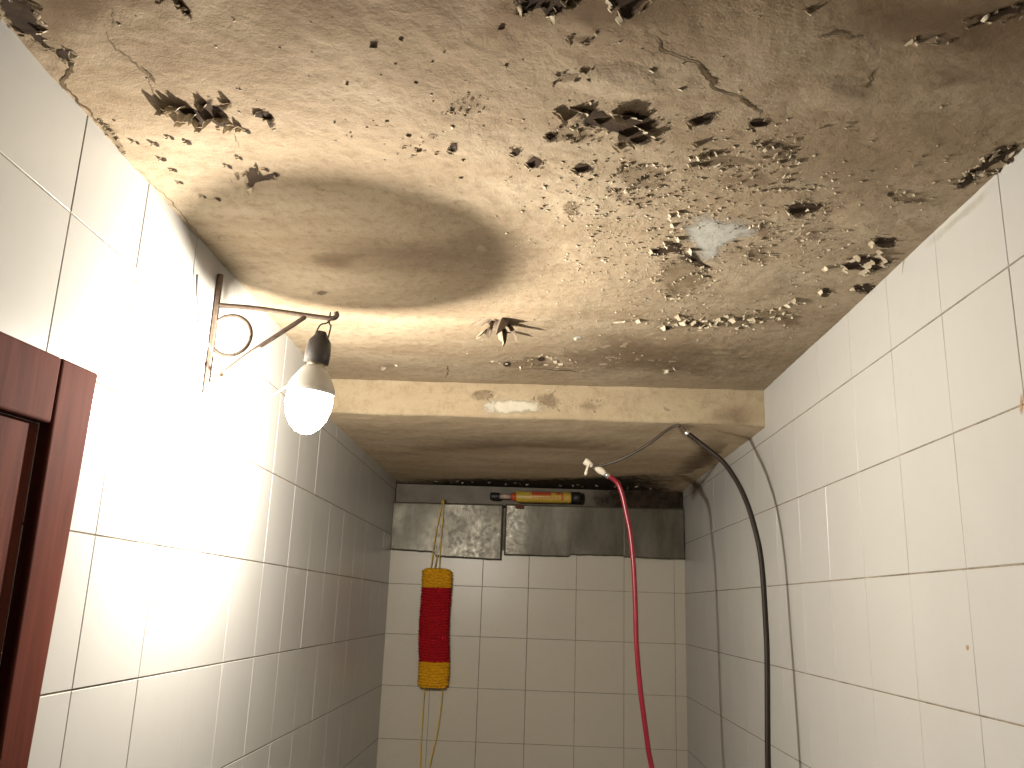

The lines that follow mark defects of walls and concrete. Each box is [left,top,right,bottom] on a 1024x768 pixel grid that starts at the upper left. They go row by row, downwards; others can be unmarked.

flaking render [0,0,79,68]
flaking render [513,0,578,25]
flaking render [605,0,653,26]
crack [644,25,762,117]
peeling [98,97,280,196]
peeling [542,101,672,208]
flaking render [950,139,1024,190]
peeling [648,209,777,301]
peeling [821,223,902,294]
peeling [469,317,571,370]
peeling [613,288,832,332]